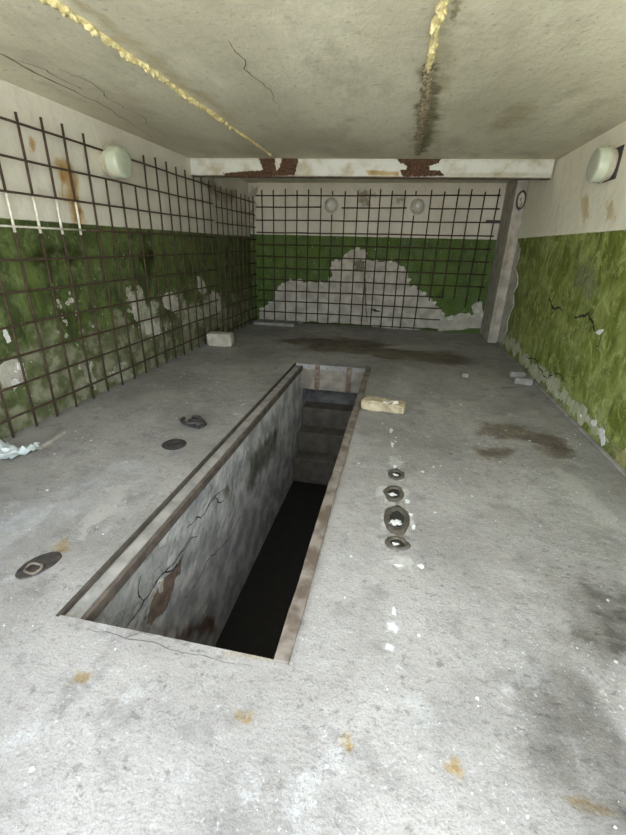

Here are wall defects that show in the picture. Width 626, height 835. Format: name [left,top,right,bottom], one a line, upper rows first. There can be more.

crack [1,54,155,135]
crack [229,42,276,103]
rust [223,158,298,178]
rust [398,159,444,177]
spalling [0,112,501,438]
crack [88,493,253,666]